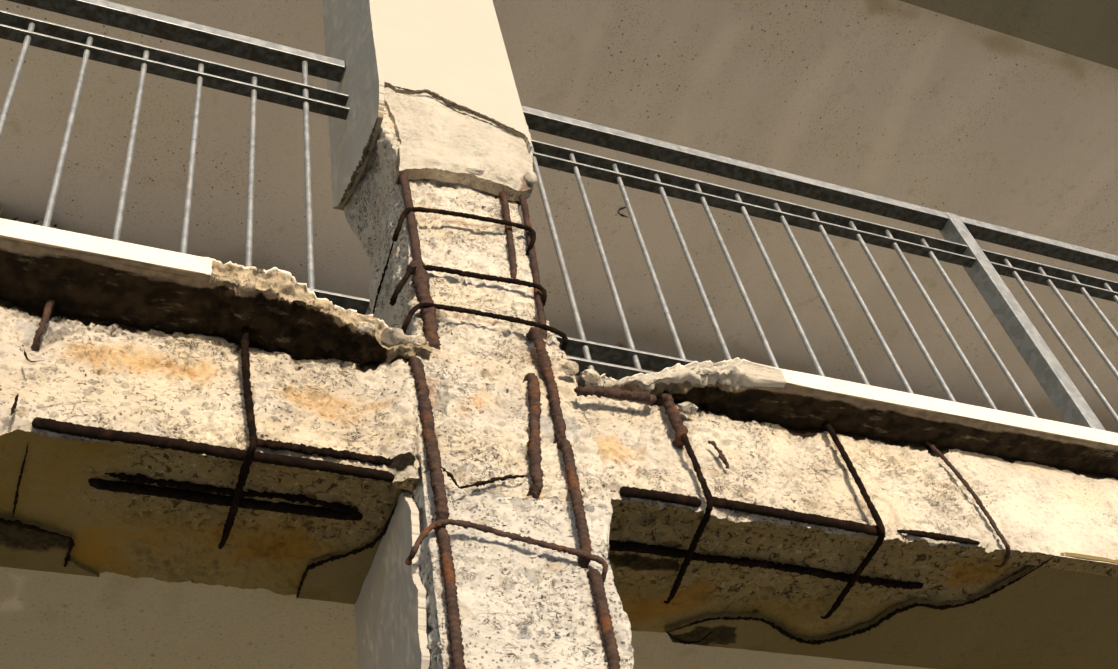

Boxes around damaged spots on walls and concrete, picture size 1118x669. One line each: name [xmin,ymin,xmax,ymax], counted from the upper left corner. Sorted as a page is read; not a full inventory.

rust [371,168,534,317]
crack [11,394,19,415]
crack [0,444,75,567]
spalling [0,313,445,668]
rust [29,263,570,499]
crack [425,459,528,489]
spalling [250,87,1118,669]
rust [661,404,719,513]
rust [823,433,890,534]
leakage [0,522,70,622]
rust [419,518,475,669]
rust [579,560,628,669]